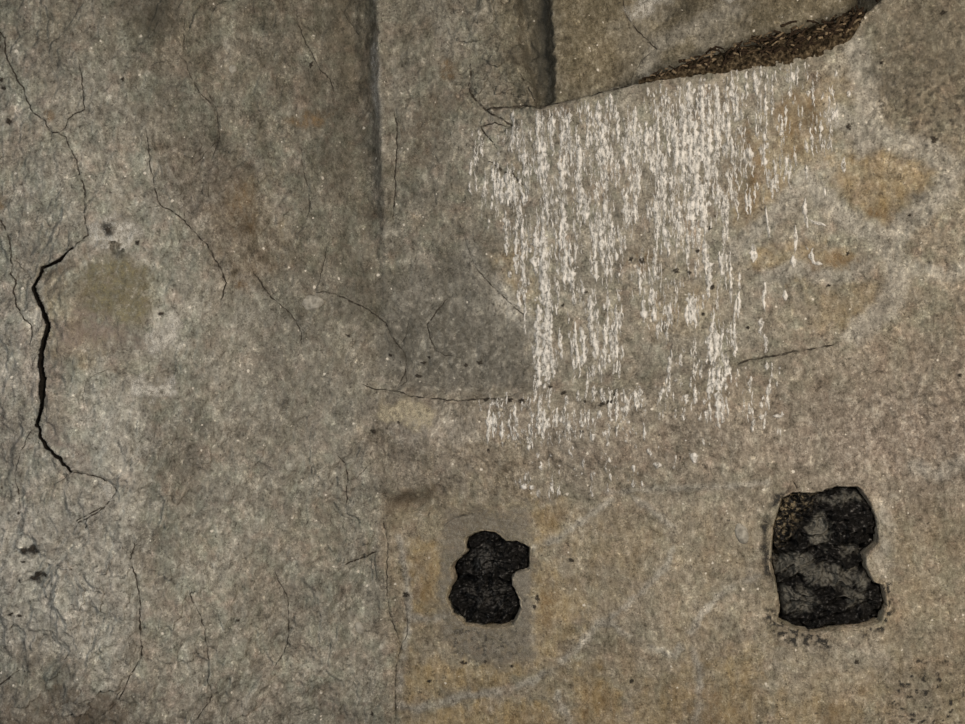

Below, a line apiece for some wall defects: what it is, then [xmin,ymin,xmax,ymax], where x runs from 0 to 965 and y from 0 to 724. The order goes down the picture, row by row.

damp [630,0,662,19]
crack [0,32,117,528]
damp [468,62,839,498]
hole [445,529,540,647]
hole [768,484,889,637]